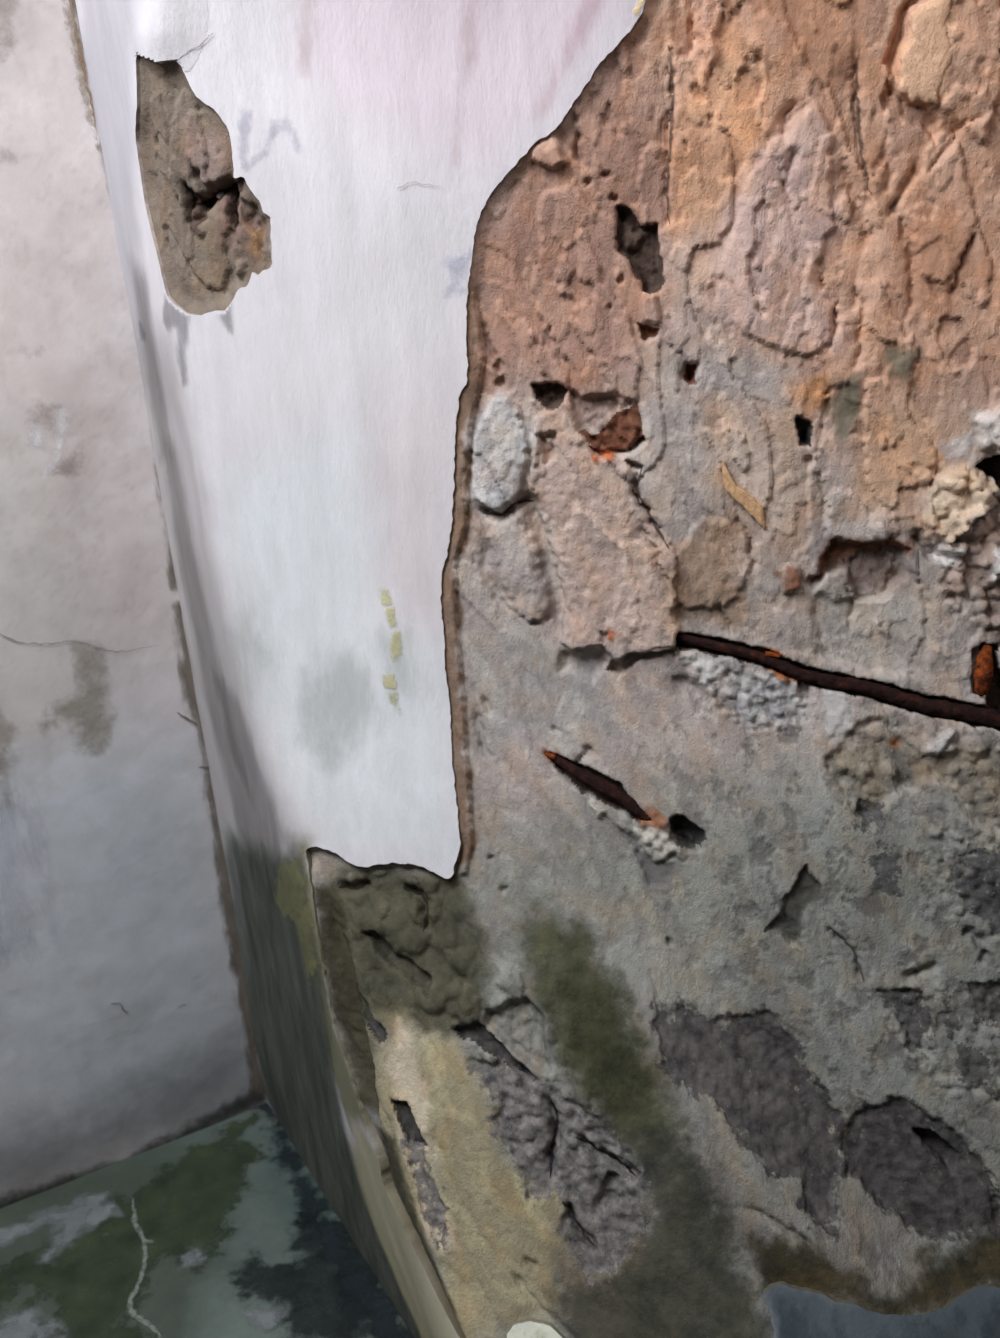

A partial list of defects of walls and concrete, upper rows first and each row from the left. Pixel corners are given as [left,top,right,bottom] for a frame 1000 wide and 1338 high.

spalling [139,56,272,315]
crack [0,634,152,652]
spalling [309,0,1000,1338]
corrosion [757,647,801,685]
corrosion [640,807,667,830]
damp [135,550,414,1338]
damp [0,1171,93,1209]
damp [380,1129,454,1311]
crack [549,1096,637,1247]
damp [466,1054,811,1338]